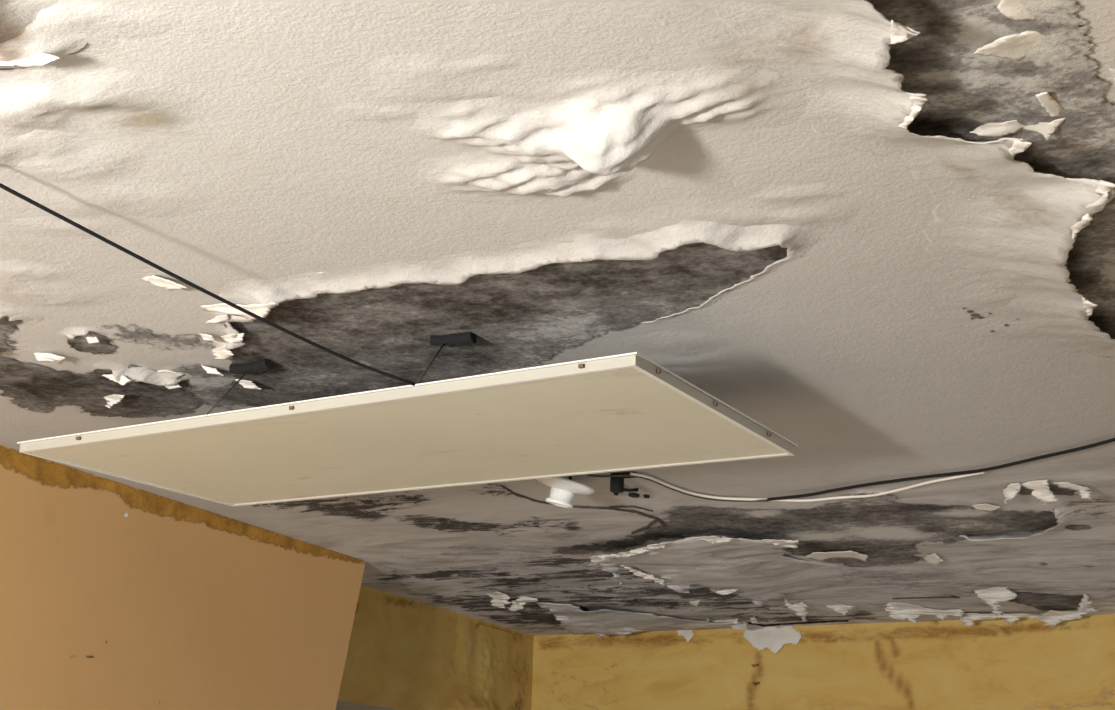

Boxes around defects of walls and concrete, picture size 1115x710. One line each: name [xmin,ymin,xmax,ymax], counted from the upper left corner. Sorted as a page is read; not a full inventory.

peeling [0,53,60,68]
peeling [0,0,61,43]
peeling [699,0,1115,358]
peeling [487,480,1100,654]